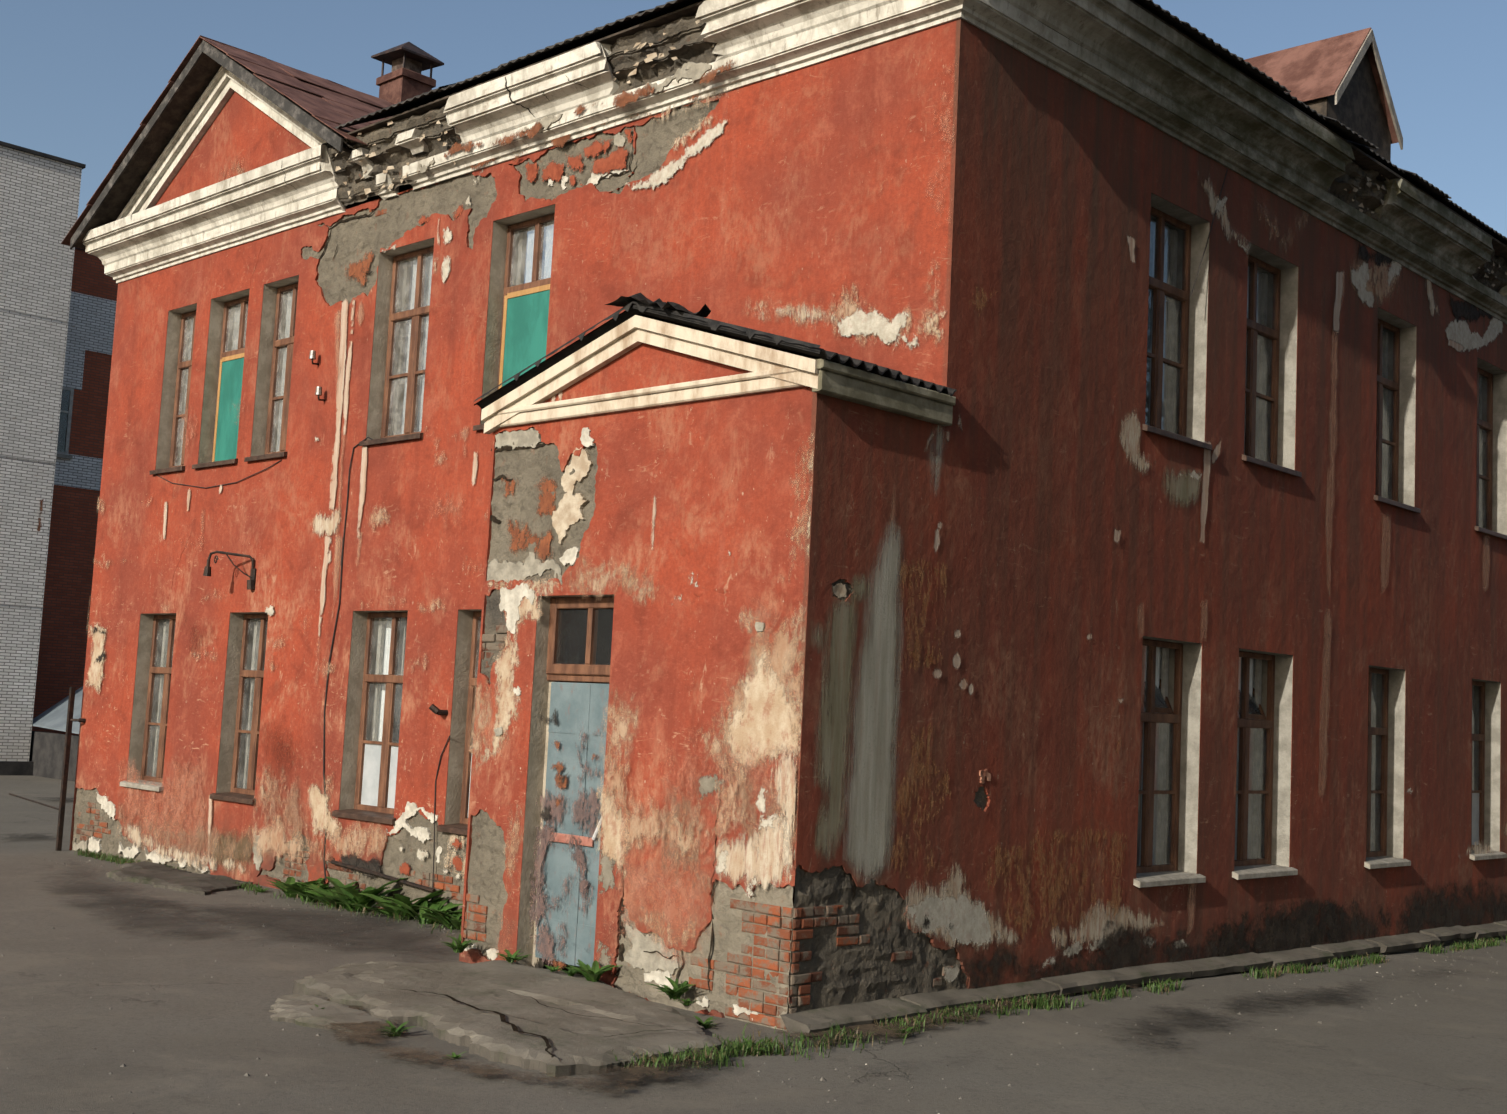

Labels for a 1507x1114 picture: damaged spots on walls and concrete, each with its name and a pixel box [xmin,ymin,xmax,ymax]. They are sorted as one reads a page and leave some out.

spalling [302,105,497,306]
spalling [515,15,728,201]
damp [329,299,364,510]
peeling [759,292,945,349]
spalling [1425,279,1503,352]
peeling [85,623,106,692]
damp [318,445,367,635]
spalling [470,427,652,767]
damp [815,514,900,881]
spalling [72,761,519,961]
spalling [596,612,1158,1031]
damp [962,879,1507,989]